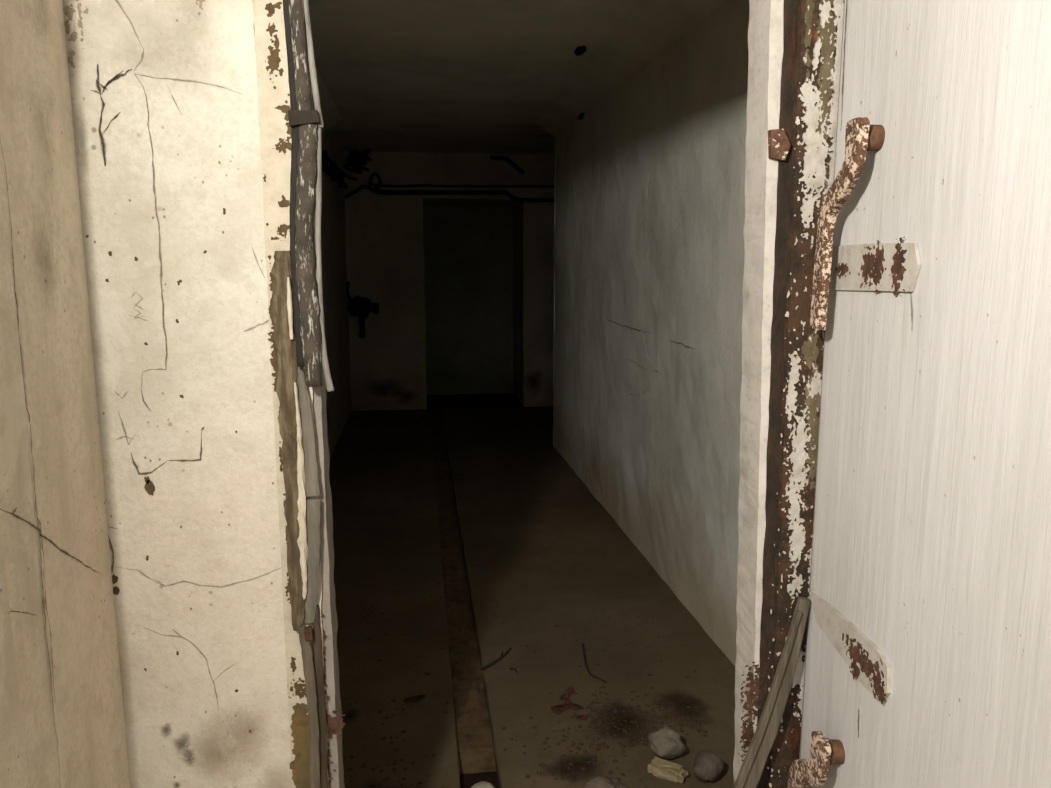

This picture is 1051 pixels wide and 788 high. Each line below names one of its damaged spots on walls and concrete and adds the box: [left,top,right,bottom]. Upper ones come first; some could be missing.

peeling [265,2,291,154]
crack [91,0,238,411]
peeling [266,223,290,241]
peeling [267,255,293,392]
peeling [768,0,844,691]
rust [835,237,907,295]
crack [0,142,277,773]
peeling [288,657,306,699]
peeling [767,645,806,788]
rust [842,633,887,705]